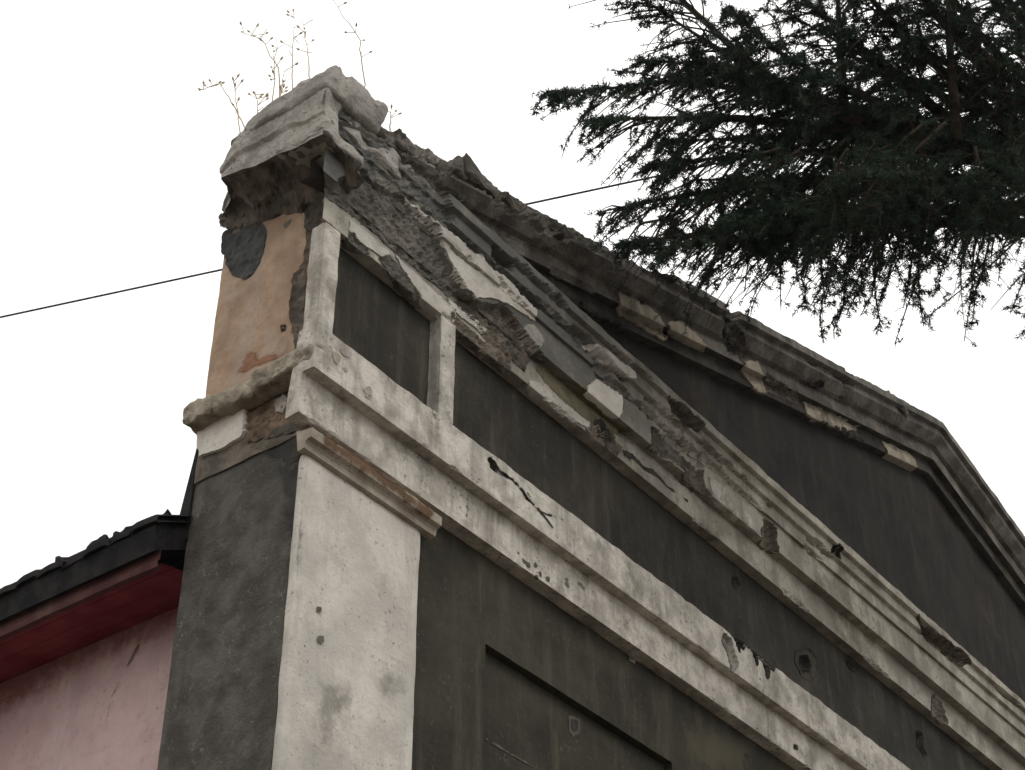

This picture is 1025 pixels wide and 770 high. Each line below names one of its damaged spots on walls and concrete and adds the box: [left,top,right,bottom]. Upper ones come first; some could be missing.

spalling [218,134,364,350]
peeling [239,352,277,372]
spalling [667,396,706,433]
crack [488,457,563,538]
spalling [722,633,776,679]
spalling [916,614,973,667]